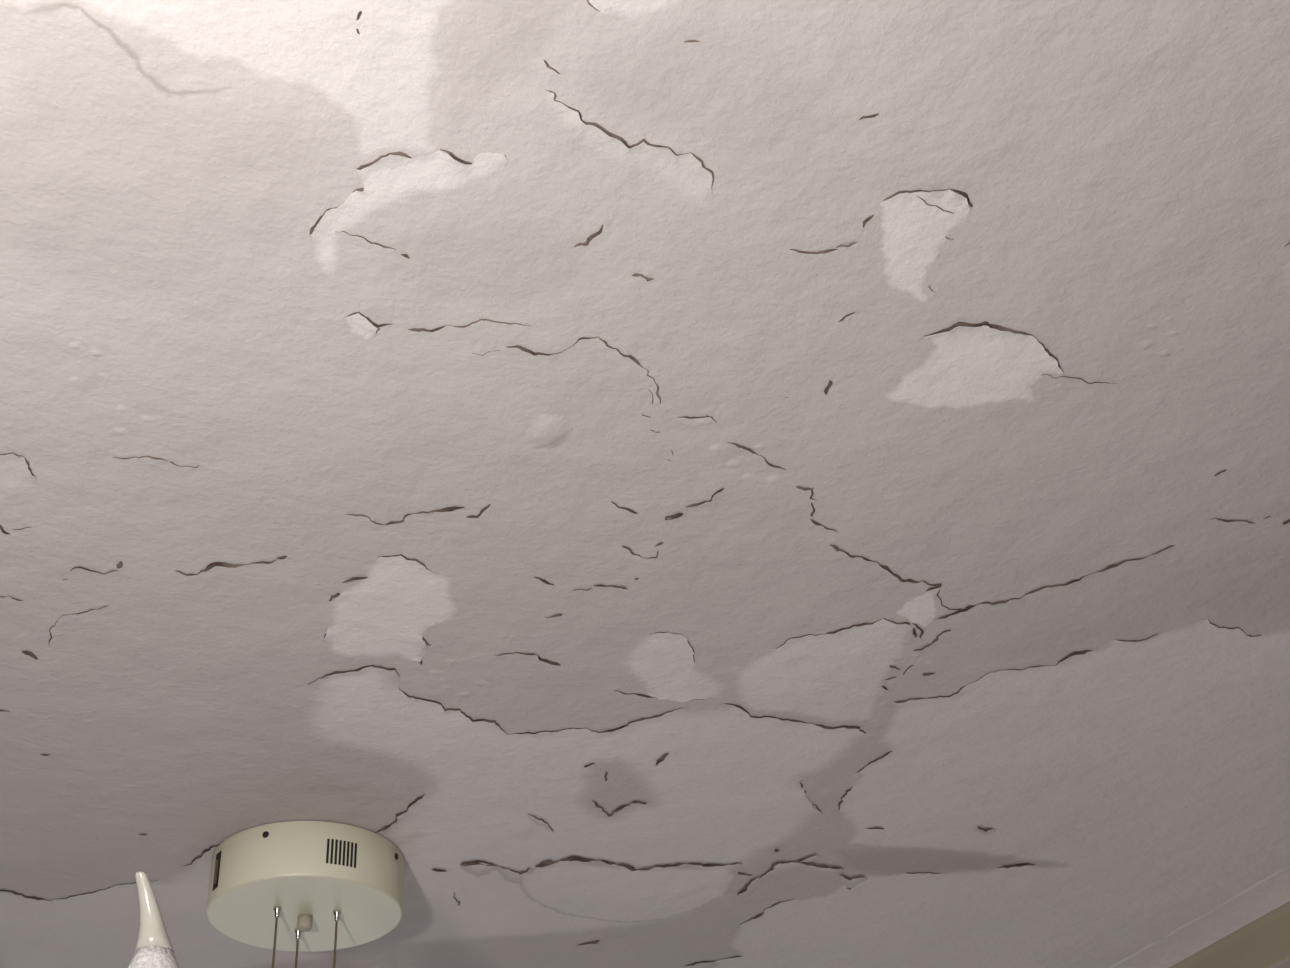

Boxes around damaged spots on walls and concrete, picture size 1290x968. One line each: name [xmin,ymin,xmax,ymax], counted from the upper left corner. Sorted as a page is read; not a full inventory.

peeling [587,0,685,22]
peeling [0,0,507,280]
peeling [543,90,717,221]
peeling [878,189,973,303]
peeling [882,321,1118,410]
crack [346,504,495,533]
crack [0,596,23,605]
crack [22,561,123,660]
crack [175,556,287,586]
peeling [0,554,1290,968]
crack [431,814,867,906]